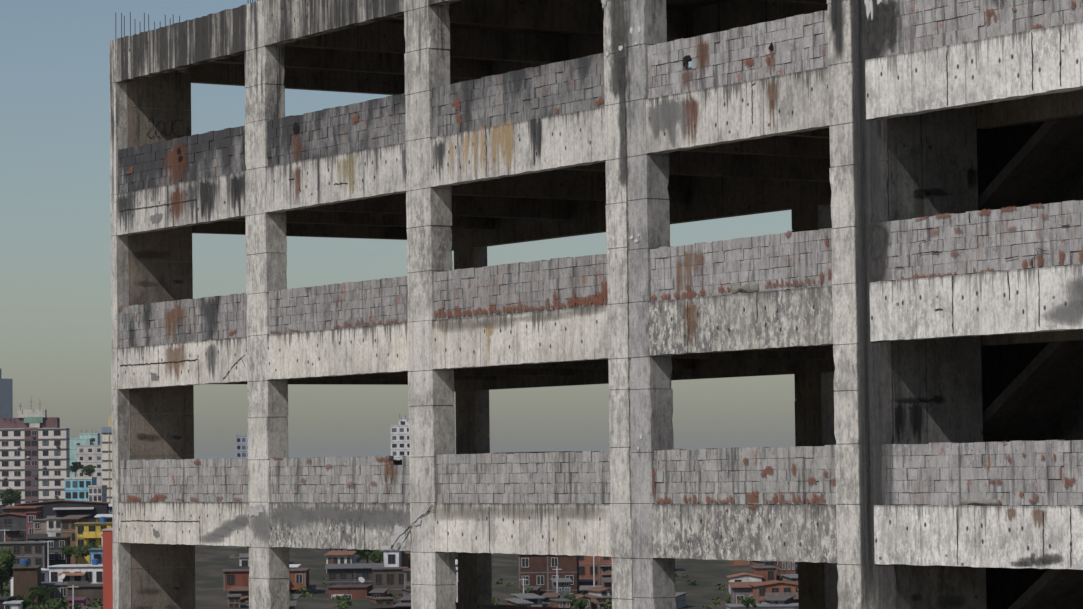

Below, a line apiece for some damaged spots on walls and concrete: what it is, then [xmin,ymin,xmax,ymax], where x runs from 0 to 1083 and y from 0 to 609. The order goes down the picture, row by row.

corrosion [699,42,708,70]
water stain [605,0,641,184]
water stain [649,100,687,147]
corrosion [683,71,697,137]
corrosion [169,145,184,223]
corrosion [677,252,700,294]
water stain [831,0,947,608]
water stain [1053,282,1083,323]
corrosion [167,305,183,377]
crack [391,504,433,550]
water stain [1012,554,1062,566]